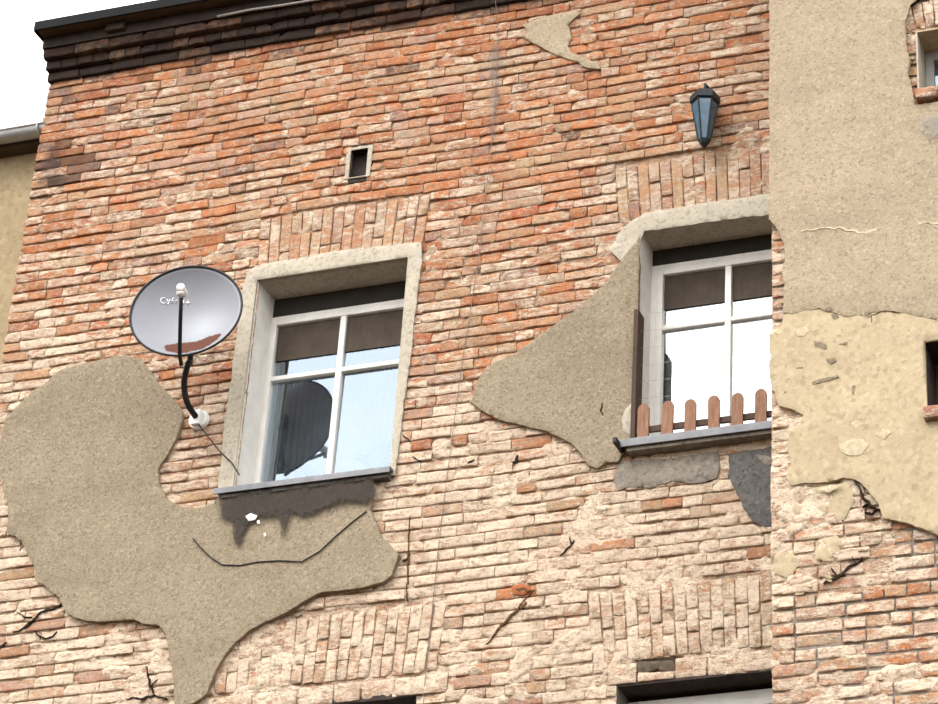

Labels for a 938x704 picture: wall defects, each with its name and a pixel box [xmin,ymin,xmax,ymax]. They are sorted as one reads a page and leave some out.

flaking render [906,0,938,105]
crack [801,226,877,234]
peeling [469,238,641,470]
flaking render [796,326,837,364]
peeling [0,355,401,704]
crack [486,587,535,645]
spalling [512,584,531,596]
flaking render [756,385,938,704]